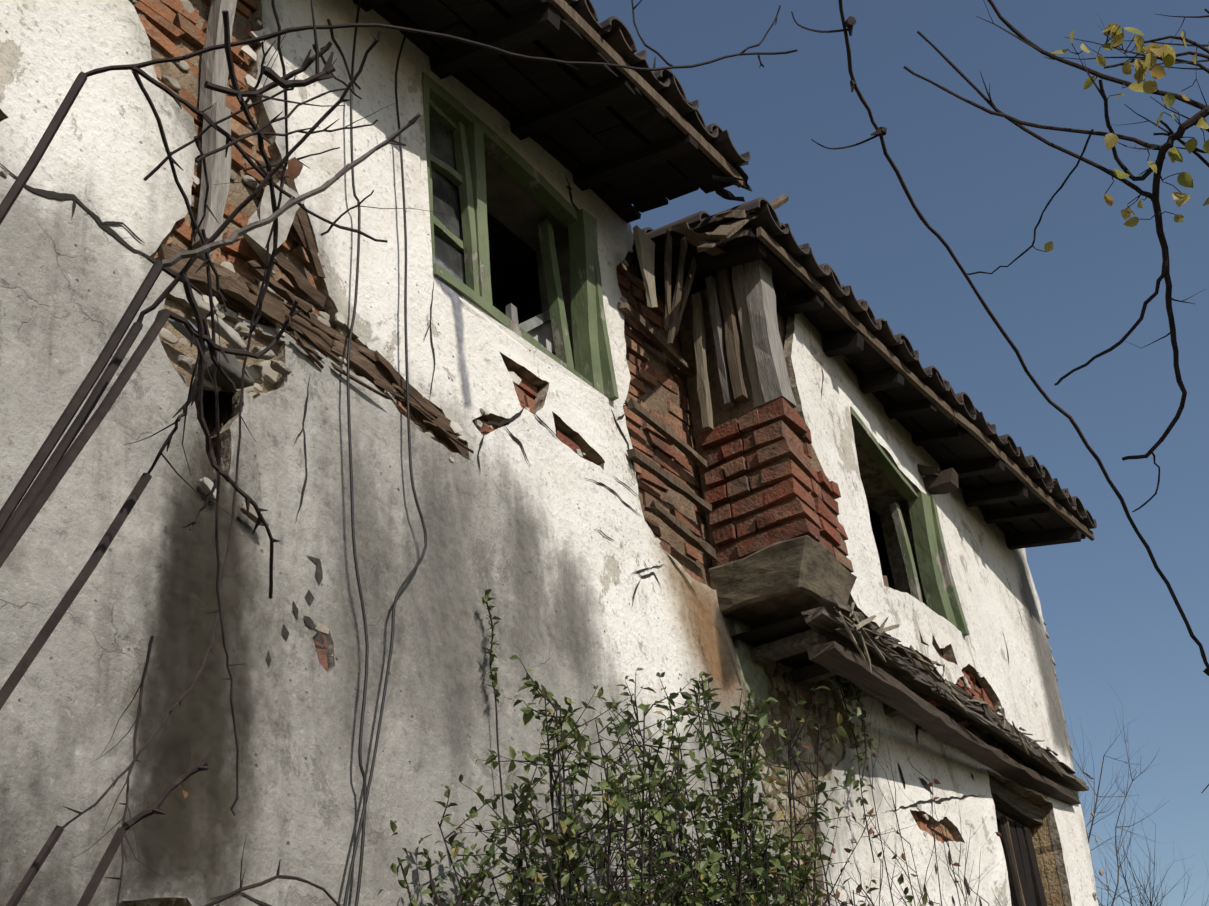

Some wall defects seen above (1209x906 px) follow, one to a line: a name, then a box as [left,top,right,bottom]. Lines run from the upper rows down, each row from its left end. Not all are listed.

flaking render [133,0,504,500]
flaking render [506,366,545,413]
flaking render [556,429,592,462]
crack [586,409,640,515]
flaking render [616,264,713,586]
spalling [240,502,269,526]
crack [631,544,695,601]
flaking render [282,556,339,671]
damp [143,439,250,888]
flaking render [955,668,1001,711]
flaking render [911,804,955,873]